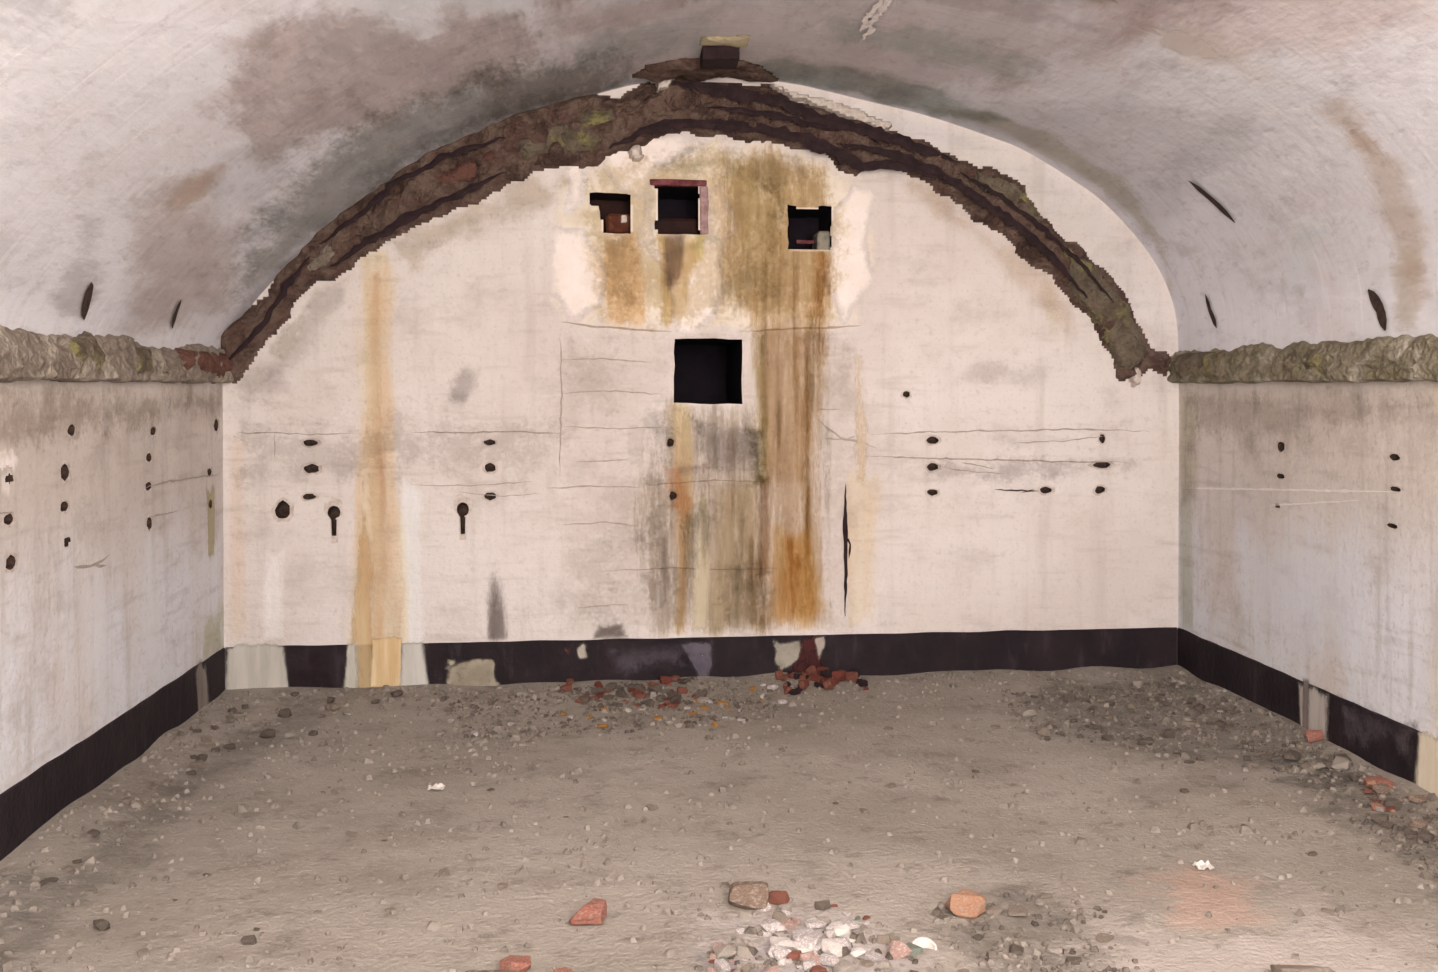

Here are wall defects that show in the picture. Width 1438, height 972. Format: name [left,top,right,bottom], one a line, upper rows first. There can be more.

peeling [298,0,548,69]
leakage [860,0,893,40]
spalling [0,35,1438,387]
flaking render [553,342,765,502]
rust [353,527,402,688]
rust [693,495,709,629]
rust [1416,592,1438,797]